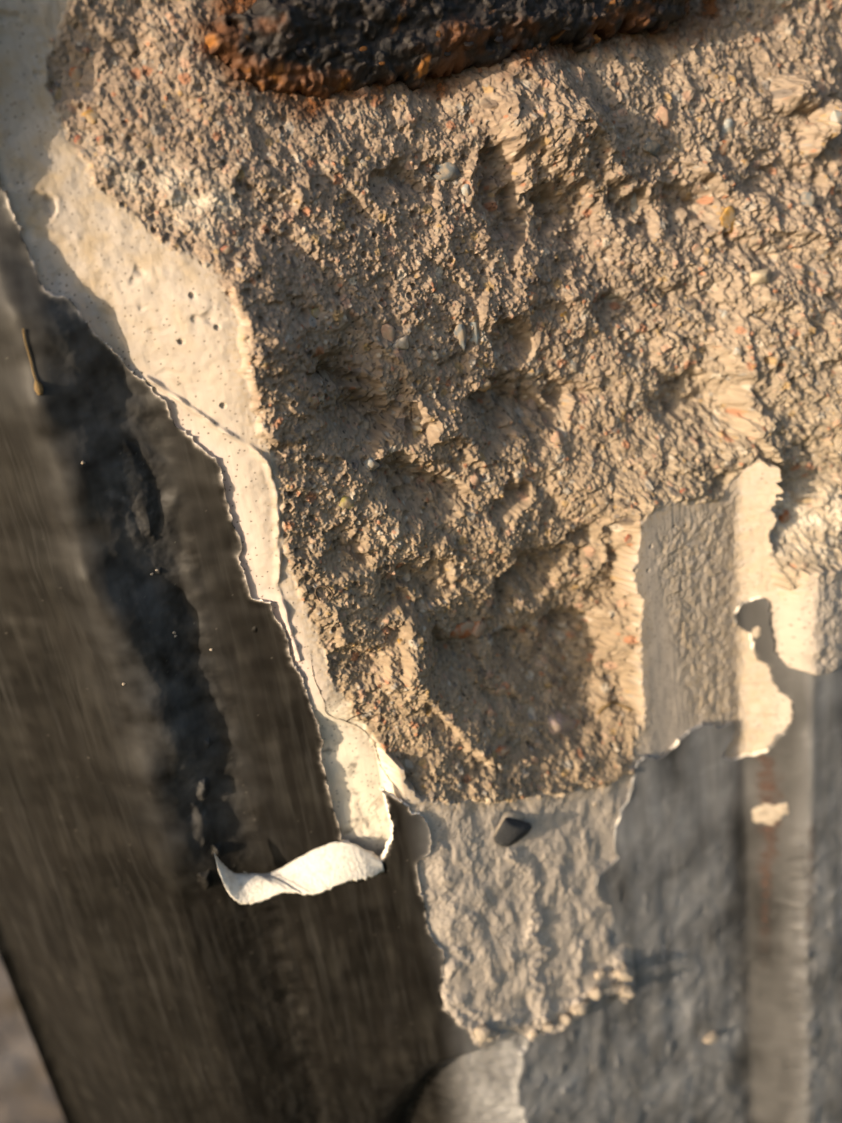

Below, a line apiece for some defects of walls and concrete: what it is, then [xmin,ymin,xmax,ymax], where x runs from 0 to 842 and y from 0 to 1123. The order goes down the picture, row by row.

corrosion [201,0,256,33]
corrosion [274,82,388,118]
spalling [0,0,842,857]
peeling [400,765,635,1048]